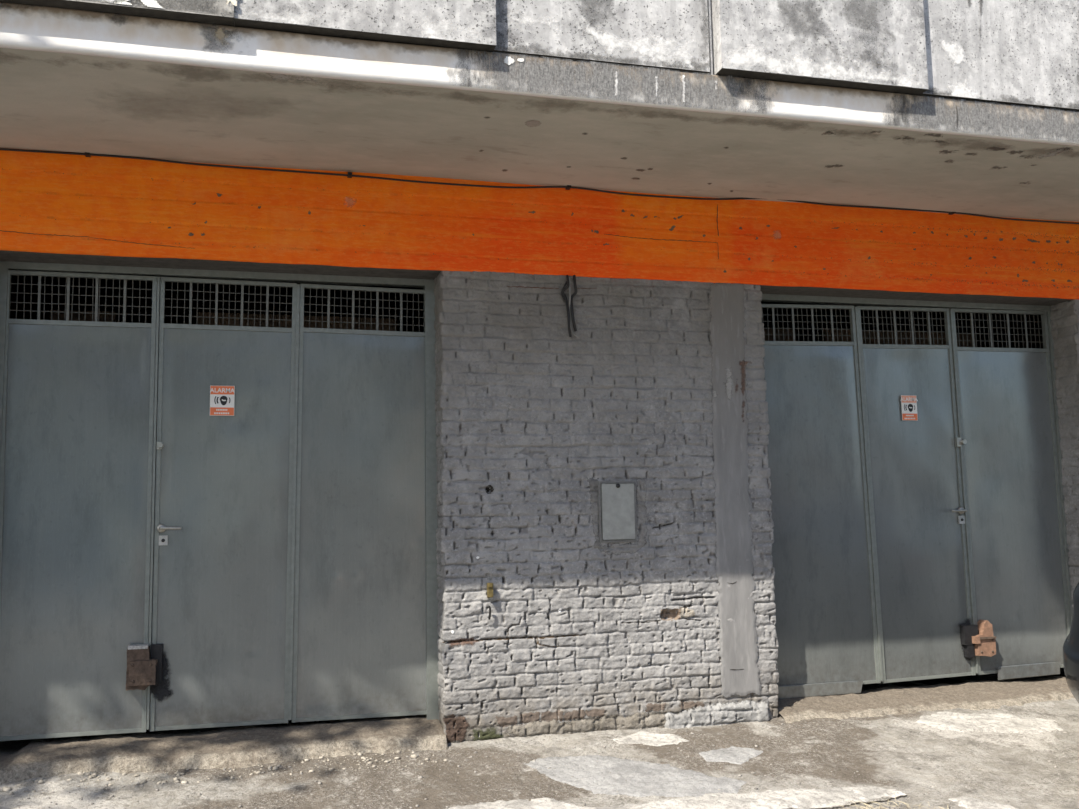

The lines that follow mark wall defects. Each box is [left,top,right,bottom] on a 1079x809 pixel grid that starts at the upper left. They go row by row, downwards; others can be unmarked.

peeling [107,0,162,8]
leakage [456,0,1079,166]
corrosion [735,360,751,422]
spalling [660,607,695,621]